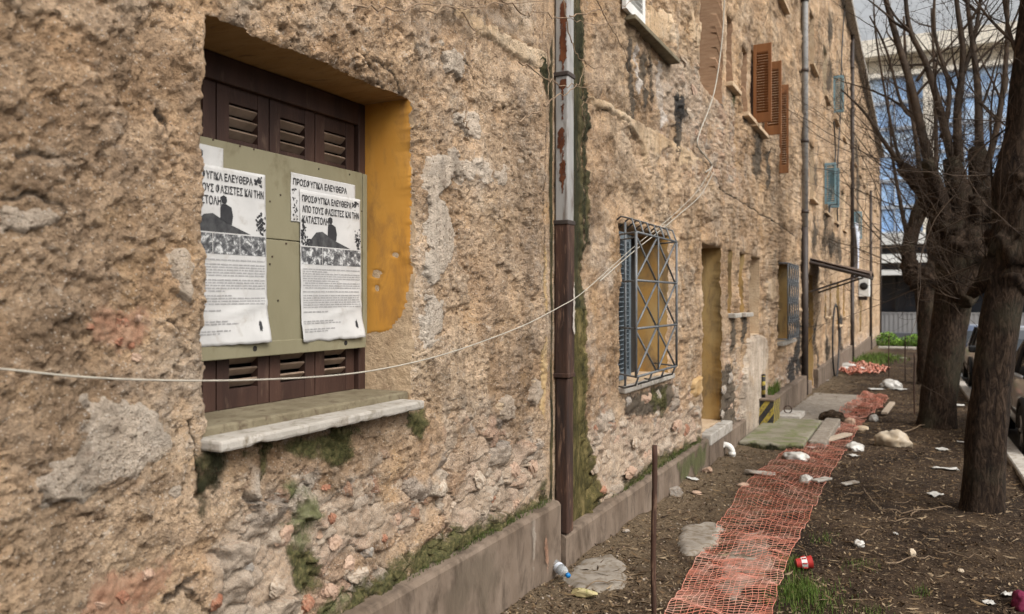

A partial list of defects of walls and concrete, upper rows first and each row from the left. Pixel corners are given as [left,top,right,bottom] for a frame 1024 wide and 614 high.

flaking render [439,39,467,81]
rust [557,1,567,193]
peeling [365,100,507,349]
damp [572,0,607,521]
flaking render [36,393,173,509]
damp [257,442,269,476]
damp [327,424,354,466]
spalling [275,525,294,547]
spalling [301,512,388,614]